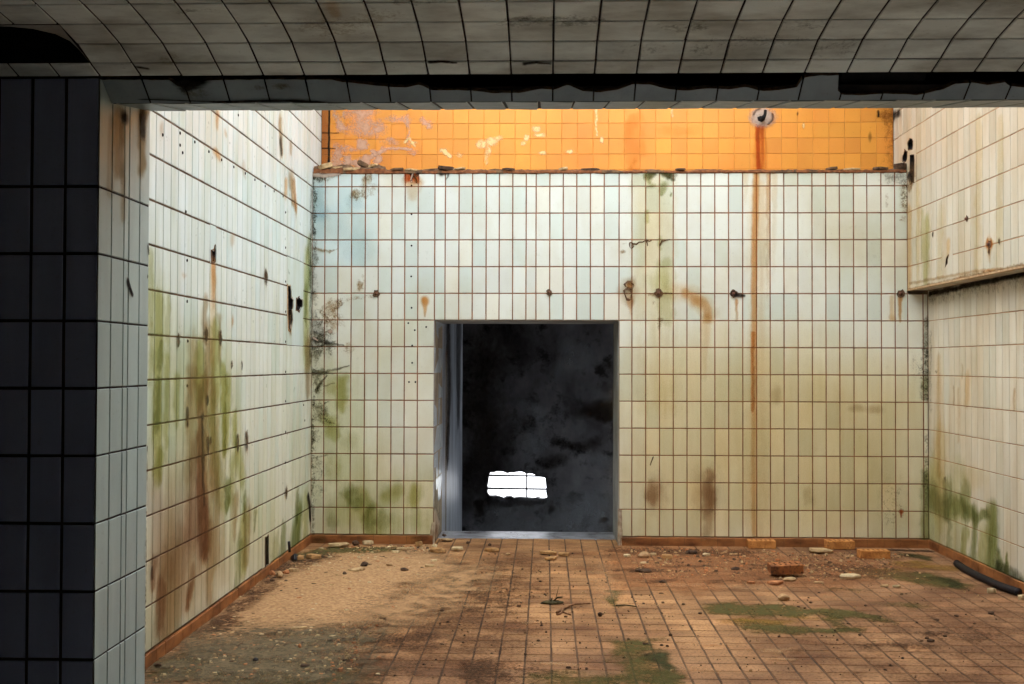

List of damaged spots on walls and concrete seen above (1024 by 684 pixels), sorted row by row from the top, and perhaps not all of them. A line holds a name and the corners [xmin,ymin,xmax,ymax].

spalling [313,108,917,184]
rust [756,124,764,169]
spalling [286,284,303,332]
leakage [309,177,348,535]
leakage [920,317,937,401]
leakage [996,561,1023,582]